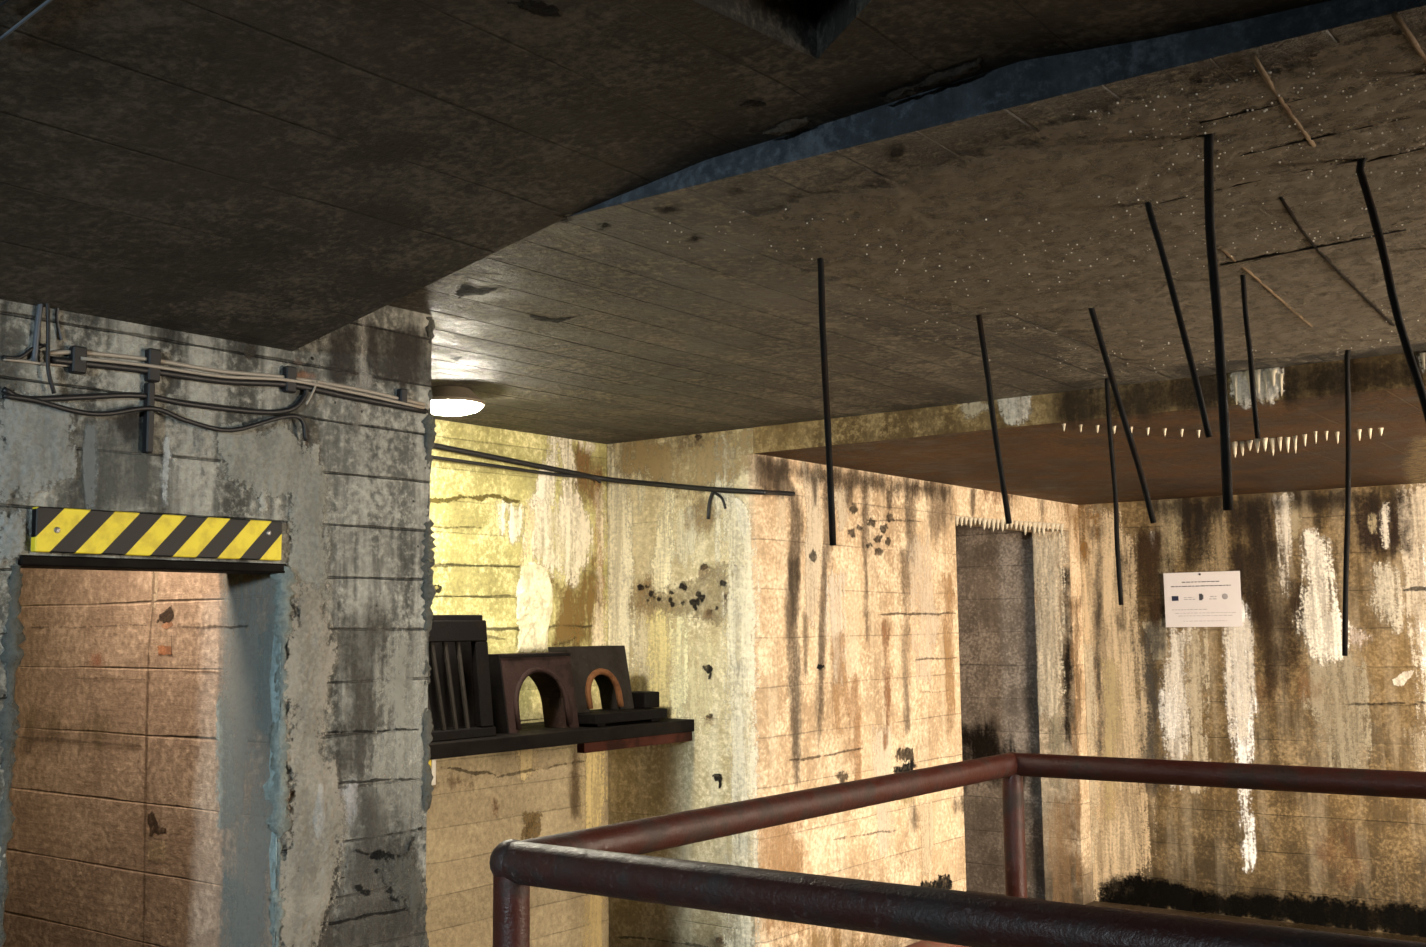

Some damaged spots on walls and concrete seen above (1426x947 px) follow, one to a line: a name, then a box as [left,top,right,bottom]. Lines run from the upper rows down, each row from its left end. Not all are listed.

spalling [507,0,560,17]
spalling [729,22,1426,367]
damp [1058,351,1426,428]
damp [498,433,760,803]
spalling [637,561,739,627]
damp [756,456,951,784]
spalling [848,503,894,555]
damp [1032,435,1426,772]
damp [314,607,423,947]
damp [725,830,759,868]
damp [961,722,1015,761]
damp [1089,780,1426,937]